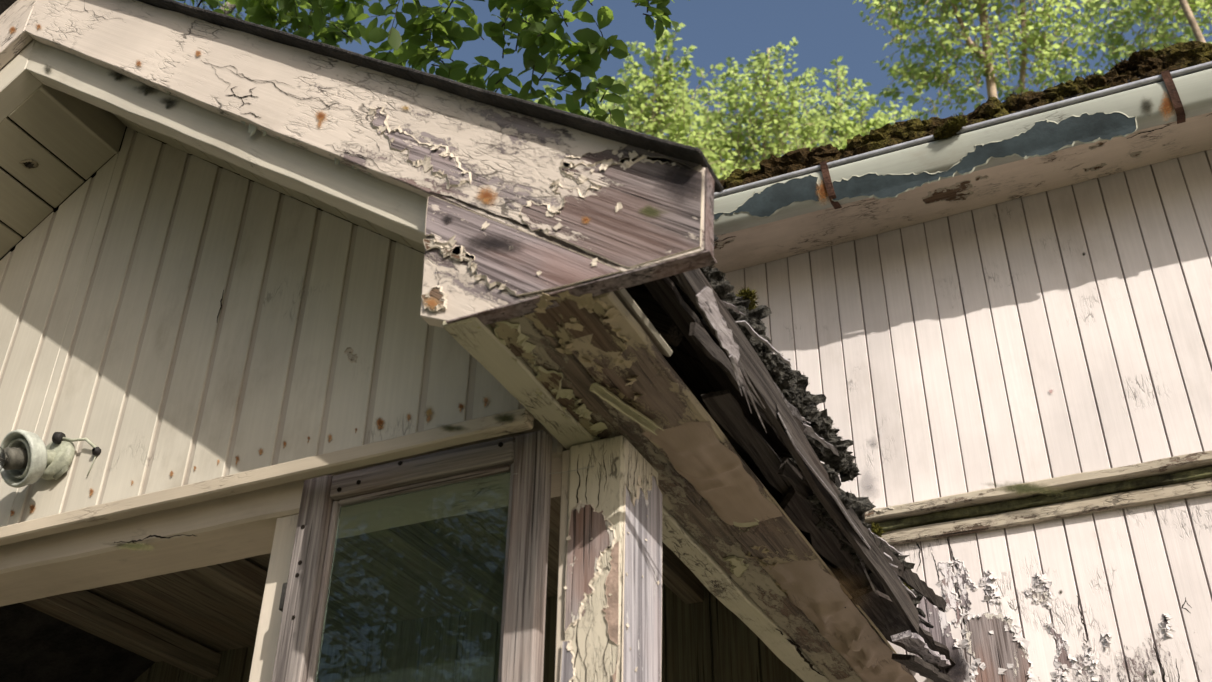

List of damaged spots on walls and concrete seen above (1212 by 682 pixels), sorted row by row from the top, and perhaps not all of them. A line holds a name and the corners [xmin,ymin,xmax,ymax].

rust [1160,97,1173,115]
crack [430,191,628,268]
peeling [368,107,1138,439]
peeling [560,474,663,682]
peeling [912,558,1036,682]
peeling [1025,573,1112,682]
peeling [1158,613,1176,638]